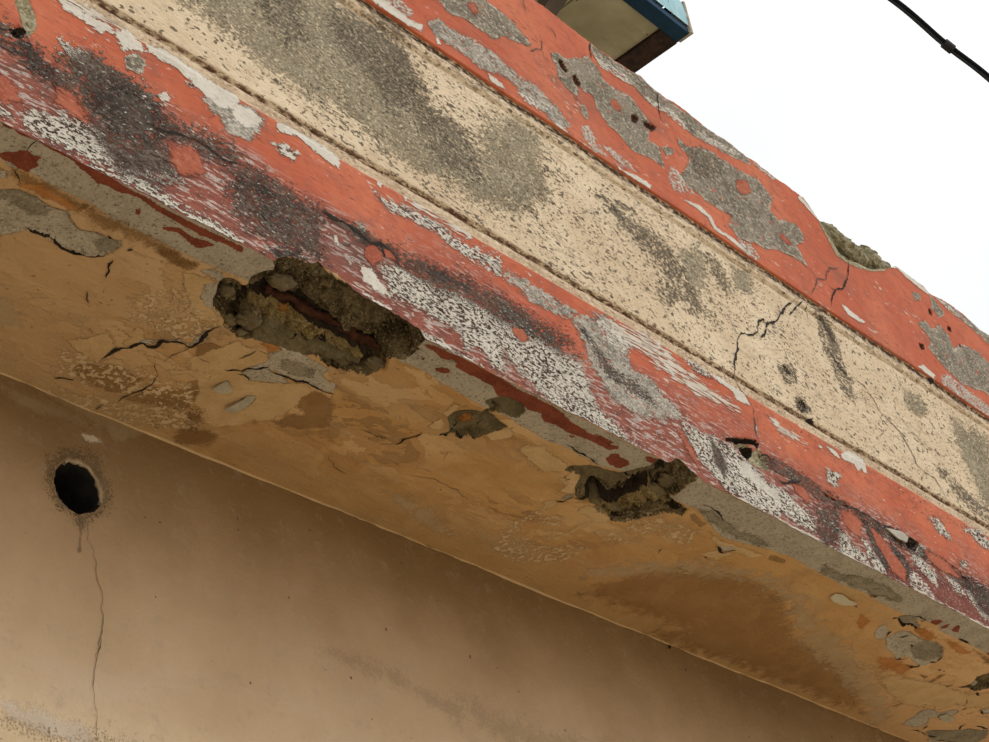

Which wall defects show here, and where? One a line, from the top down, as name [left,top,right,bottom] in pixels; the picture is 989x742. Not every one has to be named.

peeling [54,0,341,169]
peeling [372,0,808,267]
crack [96,327,332,410]
peeling [0,69,989,655]
crack [726,253,849,379]
crack [87,530,104,733]
damp [583,561,891,725]
flaking render [875,625,943,668]
flaking render [902,702,989,742]
spalling [960,673,989,696]